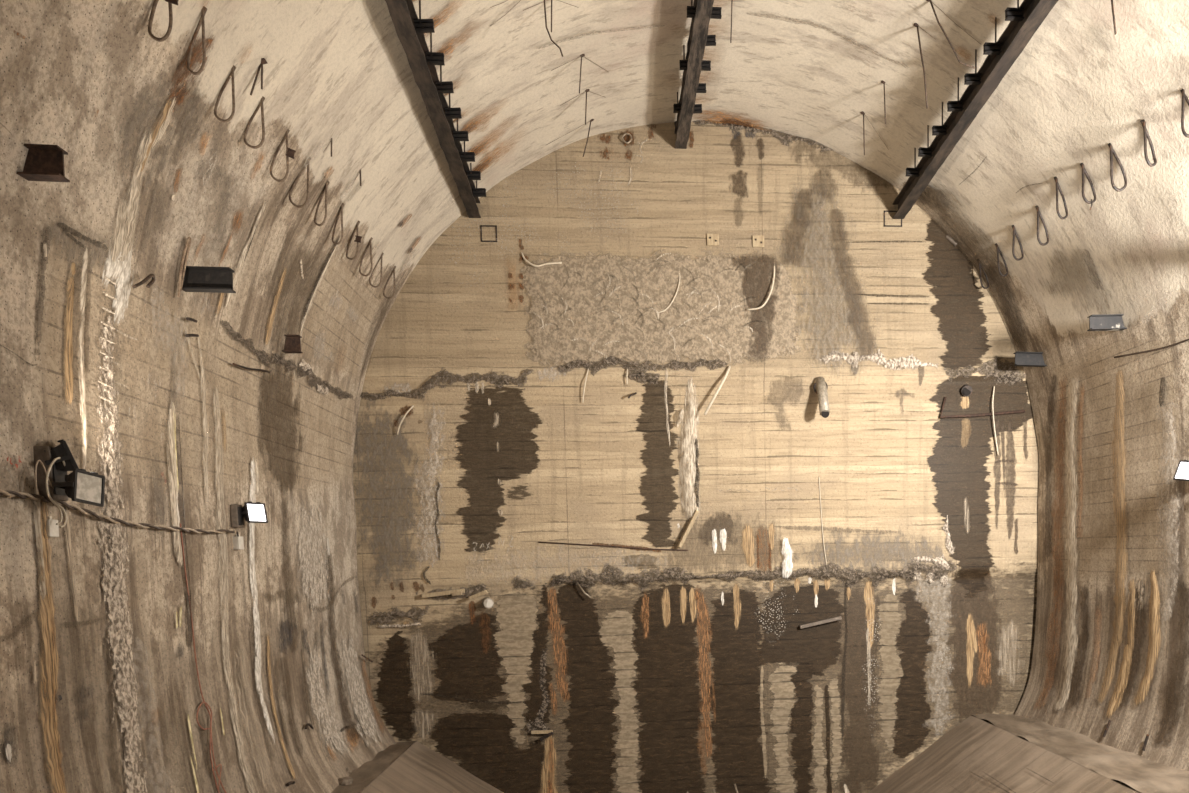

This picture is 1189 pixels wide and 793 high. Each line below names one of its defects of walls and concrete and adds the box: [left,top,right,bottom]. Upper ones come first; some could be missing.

corrosion [454,114,501,173]
spalling [520,250,801,384]
leakage [255,356,329,494]
leakage [354,404,421,584]
leakage [371,185,1038,793]